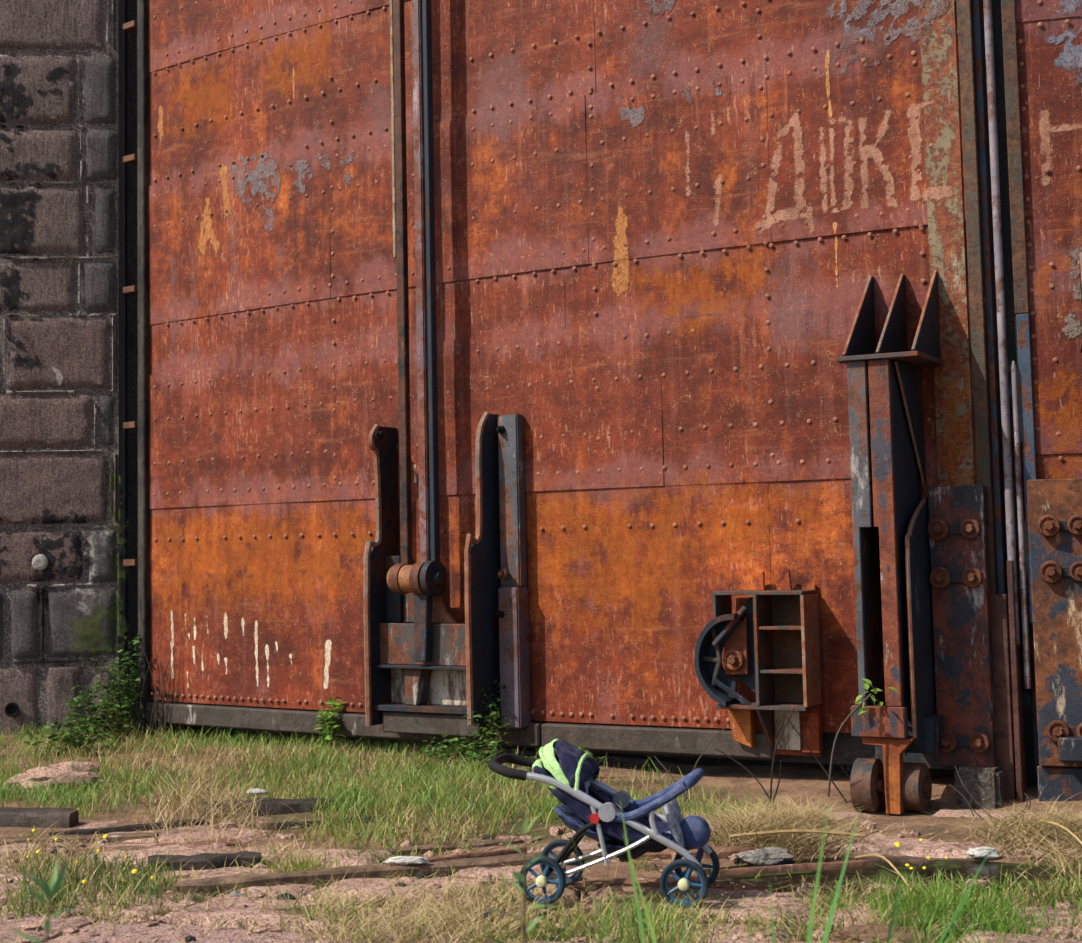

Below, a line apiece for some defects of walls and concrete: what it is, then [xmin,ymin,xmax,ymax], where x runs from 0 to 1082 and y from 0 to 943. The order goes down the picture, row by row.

peeling [827,0,961,76]
peeling [1047,30,1082,84]
peeling [1057,0,1082,17]
water stain [0,52,115,394]
peeling [198,152,281,255]
peeling [294,153,355,194]
water stain [27,509,111,614]